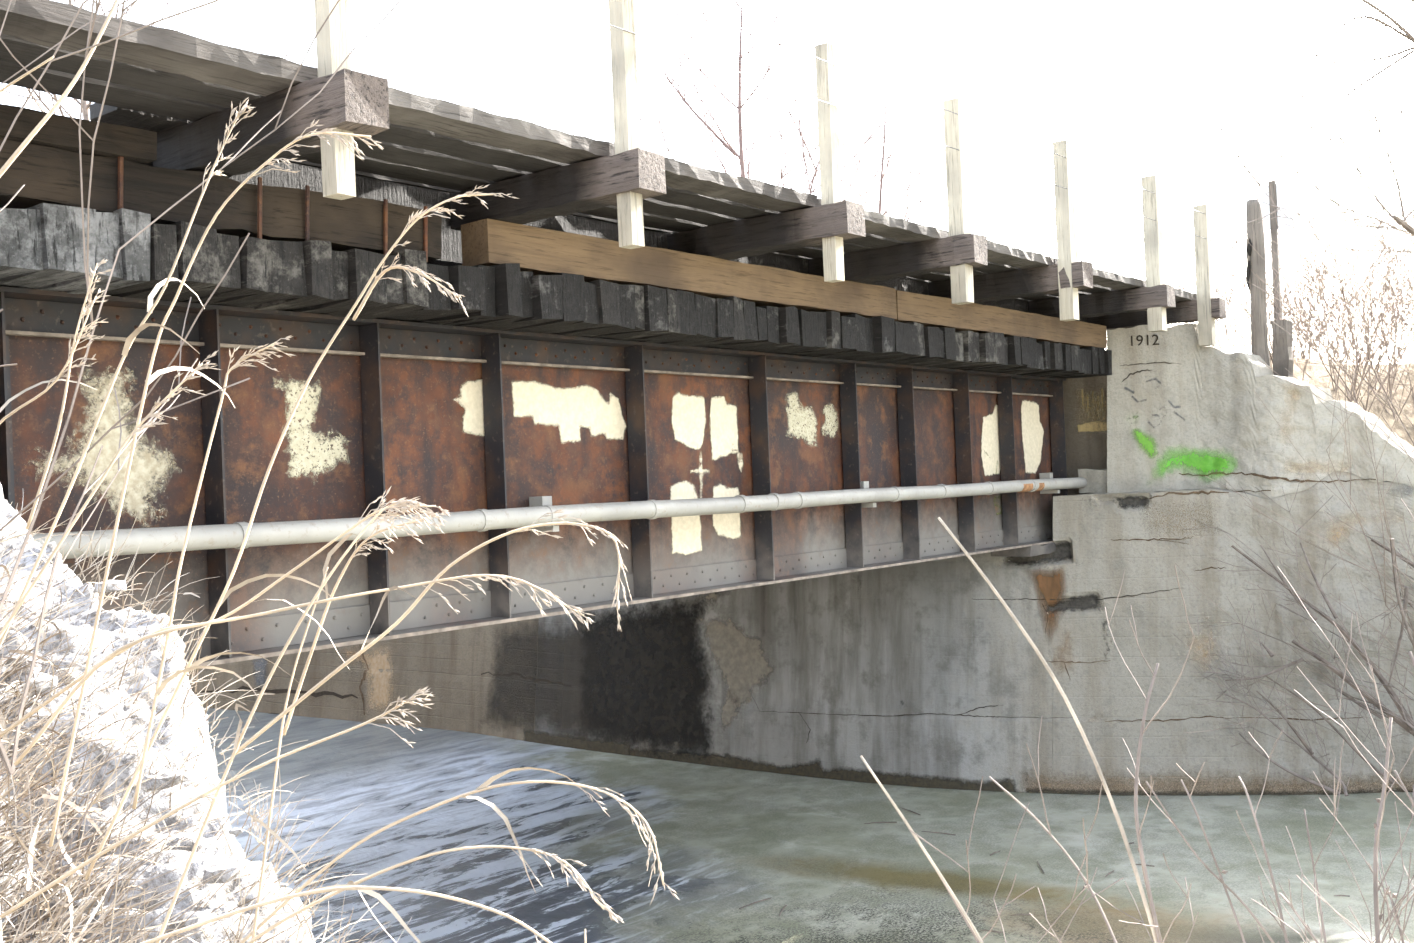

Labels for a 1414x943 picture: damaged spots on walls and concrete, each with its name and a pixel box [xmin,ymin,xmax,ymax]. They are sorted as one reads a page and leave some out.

crack [1149,472,1376,499]
rust [1033,571,1063,634]
crack [196,646,369,715]
damp [524,600,1414,796]